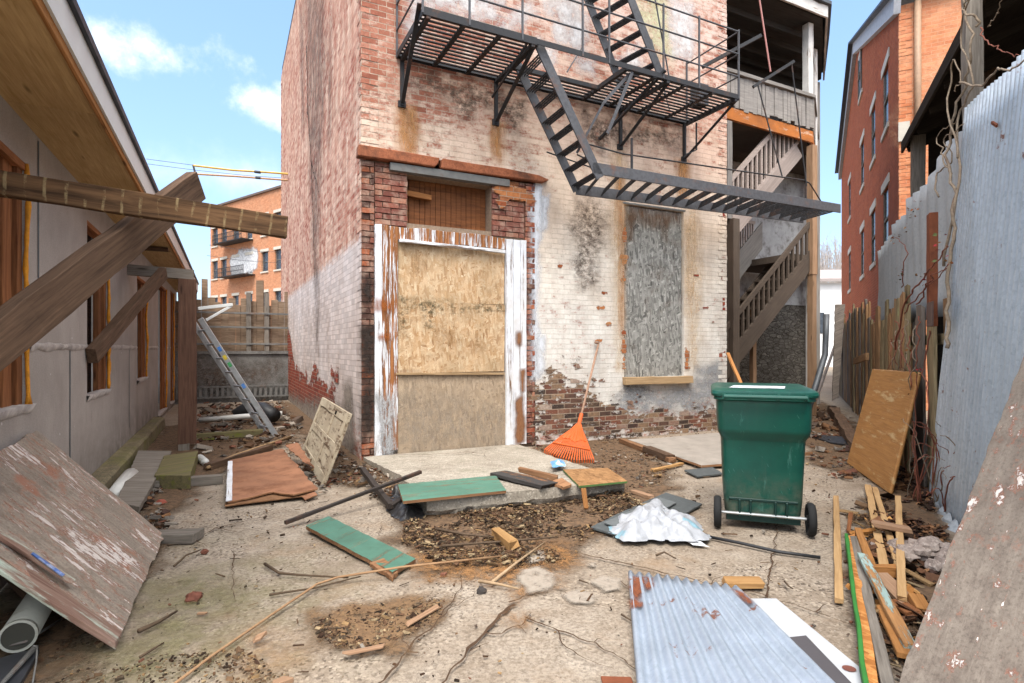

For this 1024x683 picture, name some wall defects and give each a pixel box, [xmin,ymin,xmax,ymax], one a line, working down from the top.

leakage [571,204,603,287]
peeling [287,330,339,406]
peeling [515,356,718,445]